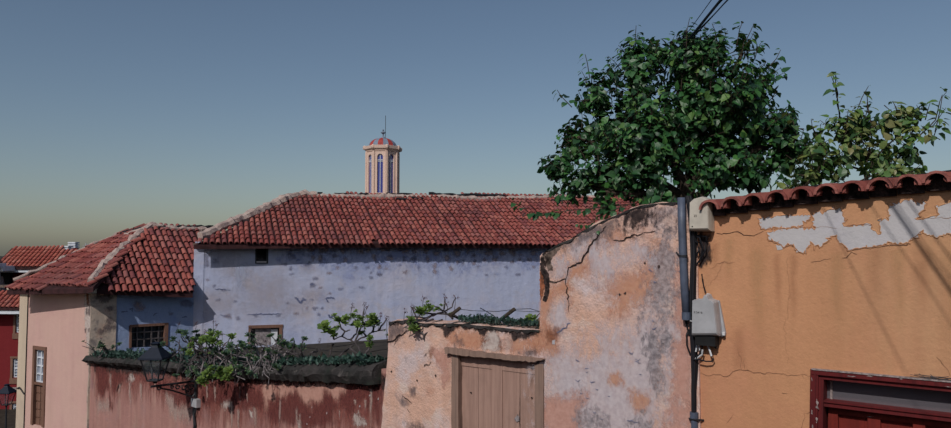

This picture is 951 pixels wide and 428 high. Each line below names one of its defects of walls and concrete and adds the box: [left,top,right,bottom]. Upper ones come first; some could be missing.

crack [556,226,654,333]
damp [544,208,681,428]
peeling [757,198,951,255]
damp [94,363,386,428]